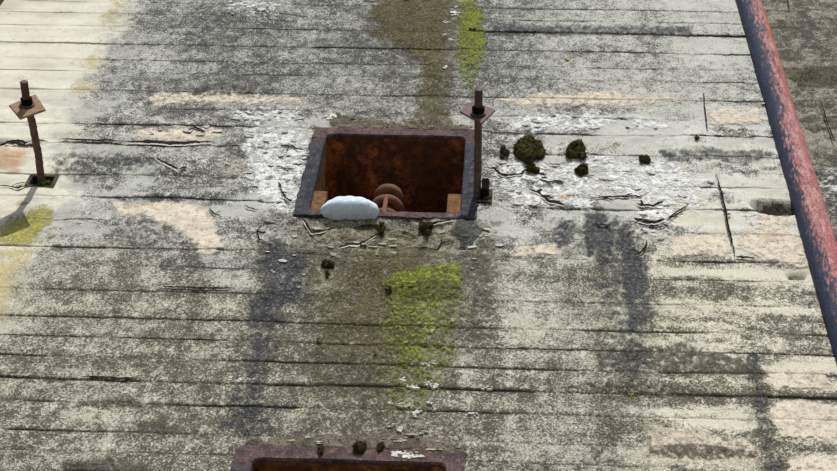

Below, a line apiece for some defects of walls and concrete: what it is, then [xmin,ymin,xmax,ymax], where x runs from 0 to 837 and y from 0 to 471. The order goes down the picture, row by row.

damp [356,0,463,129]
crack [0,125,212,172]
crack [716,174,754,258]
damp [220,219,496,438]
damp [546,204,659,423]